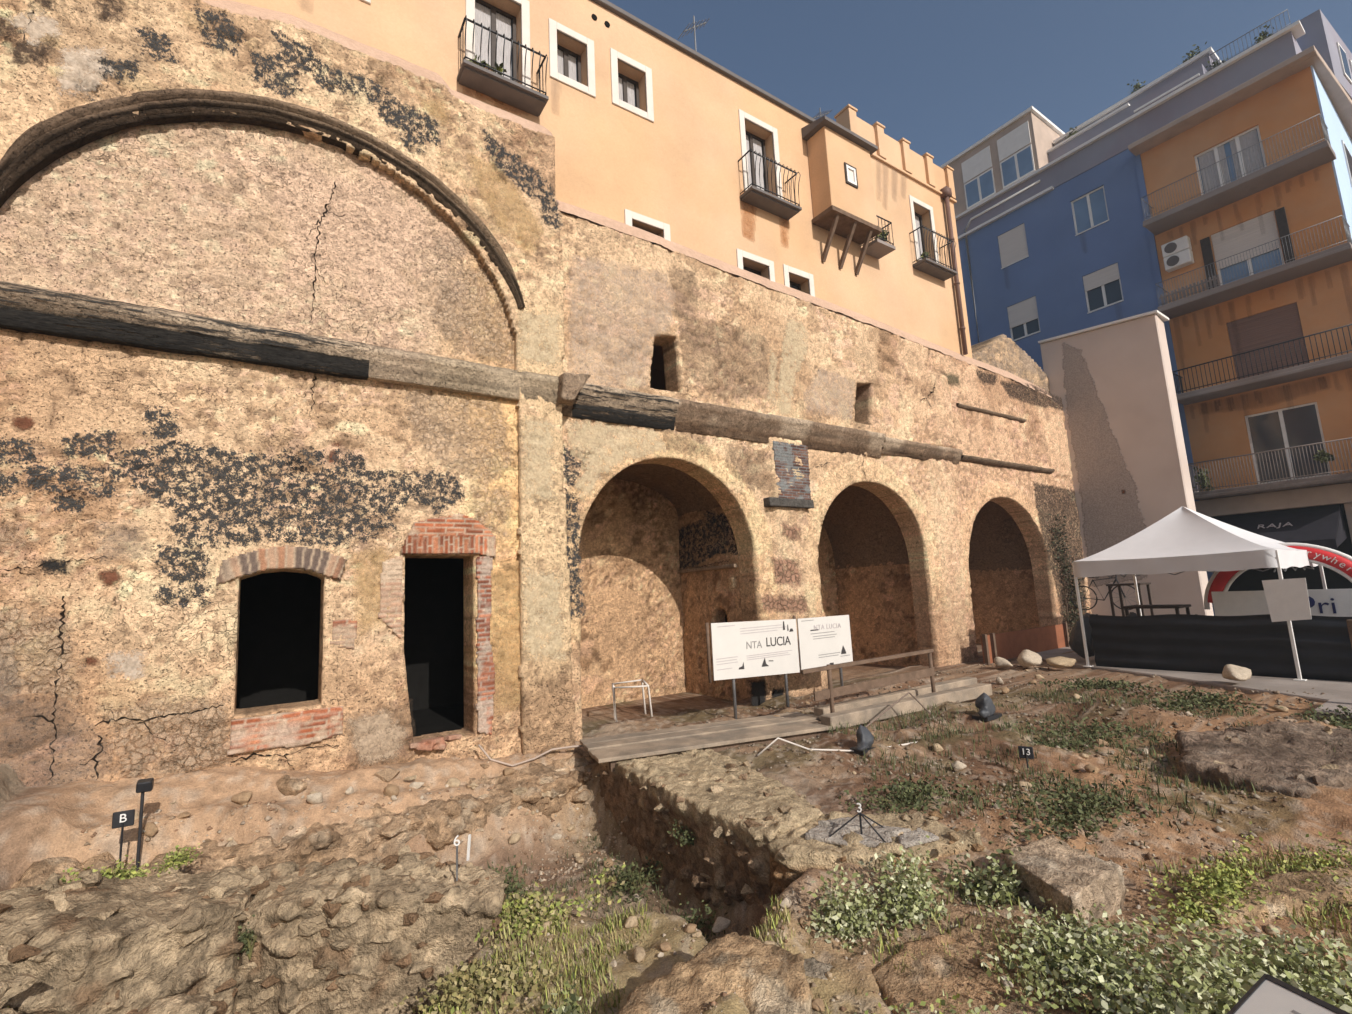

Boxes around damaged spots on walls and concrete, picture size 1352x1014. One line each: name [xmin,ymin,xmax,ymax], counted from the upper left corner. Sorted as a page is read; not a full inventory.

crack [309,182,345,324]
crack [0,556,113,578]
flaking render [1033,343,1147,626]
crack [19,596,223,780]